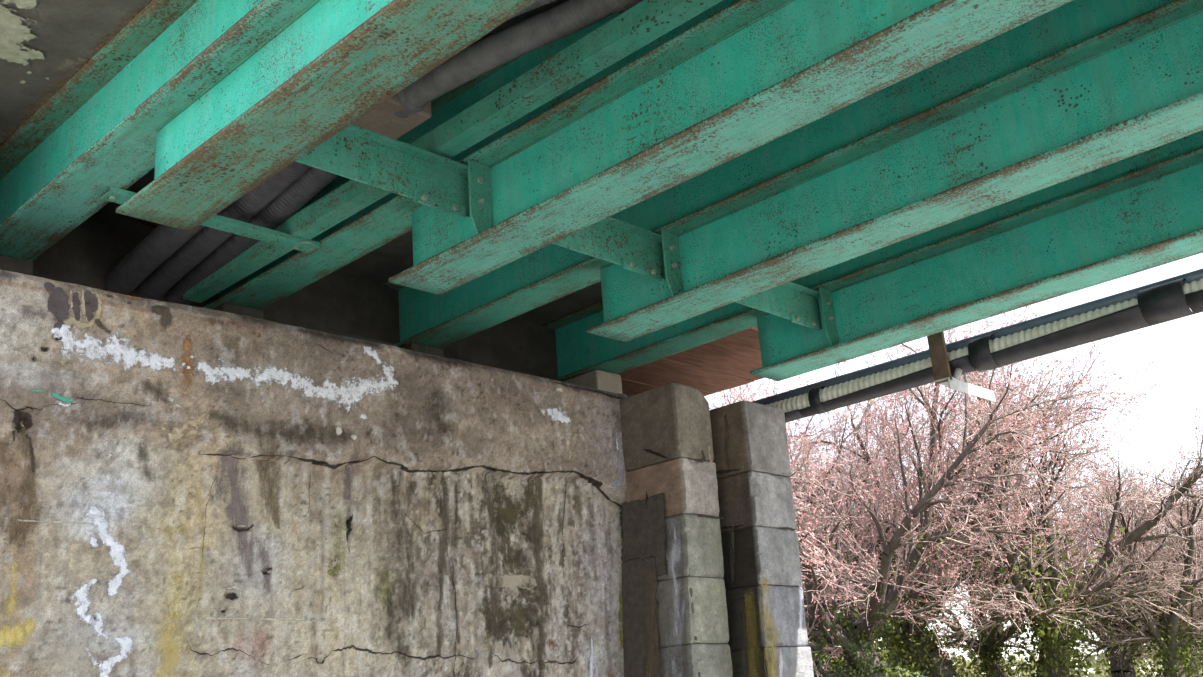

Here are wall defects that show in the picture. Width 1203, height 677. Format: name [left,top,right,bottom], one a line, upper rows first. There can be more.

peeling [0,0,45,84]
damp [50,324,175,403]
damp [210,412,360,592]
damp [195,346,398,419]
crack [187,512,588,672]
crack [185,454,648,574]
damp [386,471,492,677]
damp [484,471,506,637]
damp [520,469,548,677]
damp [588,637,598,677]
damp [618,493,681,677]
crack [644,449,669,459]